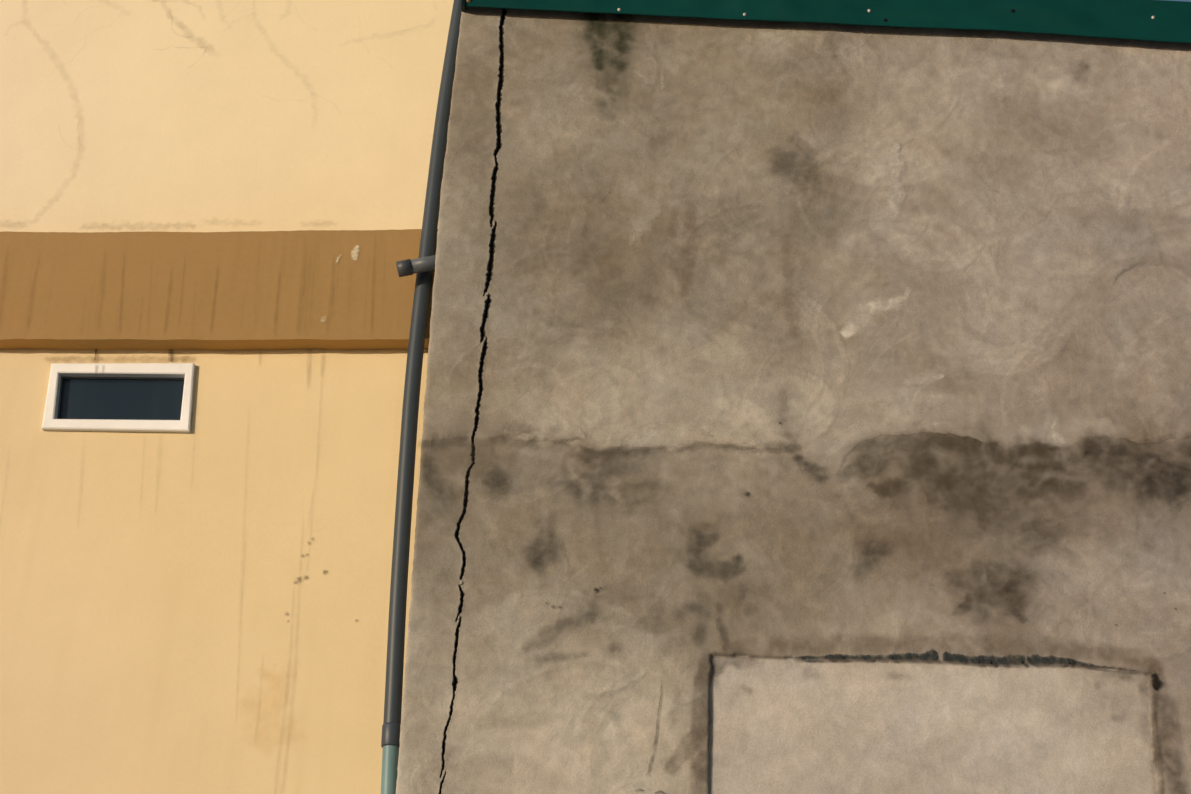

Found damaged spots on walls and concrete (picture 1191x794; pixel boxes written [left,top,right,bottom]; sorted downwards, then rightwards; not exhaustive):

crack [439,9,507,794]
damp [1020,424,1064,469]